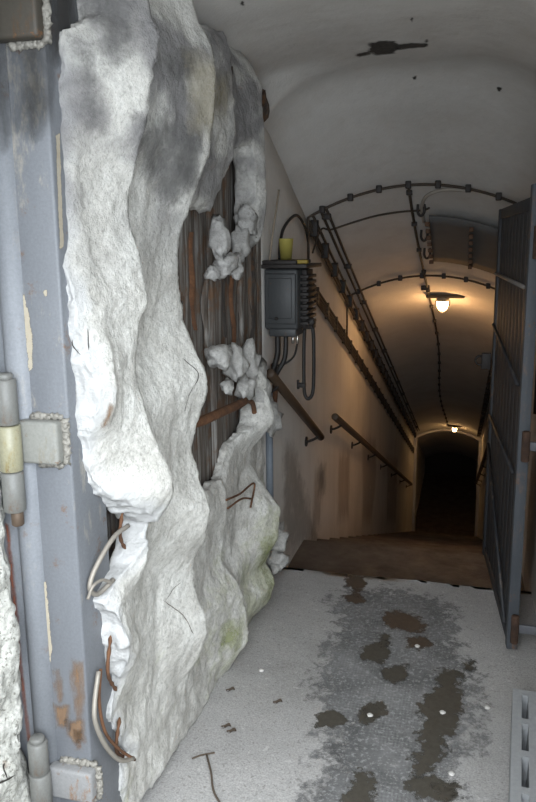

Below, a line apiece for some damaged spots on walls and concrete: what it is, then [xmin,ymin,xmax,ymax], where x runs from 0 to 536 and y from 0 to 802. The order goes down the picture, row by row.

rust [118,513,126,549]
water stain [342,574,369,604]
rust [106,635,117,691]
water stain [360,610,434,685]
rust [56,665,83,742]
rust [114,717,125,758]
water stain [314,709,348,728]
water stain [358,701,389,726]
water stain [403,659,478,802]
water stain [339,767,379,802]